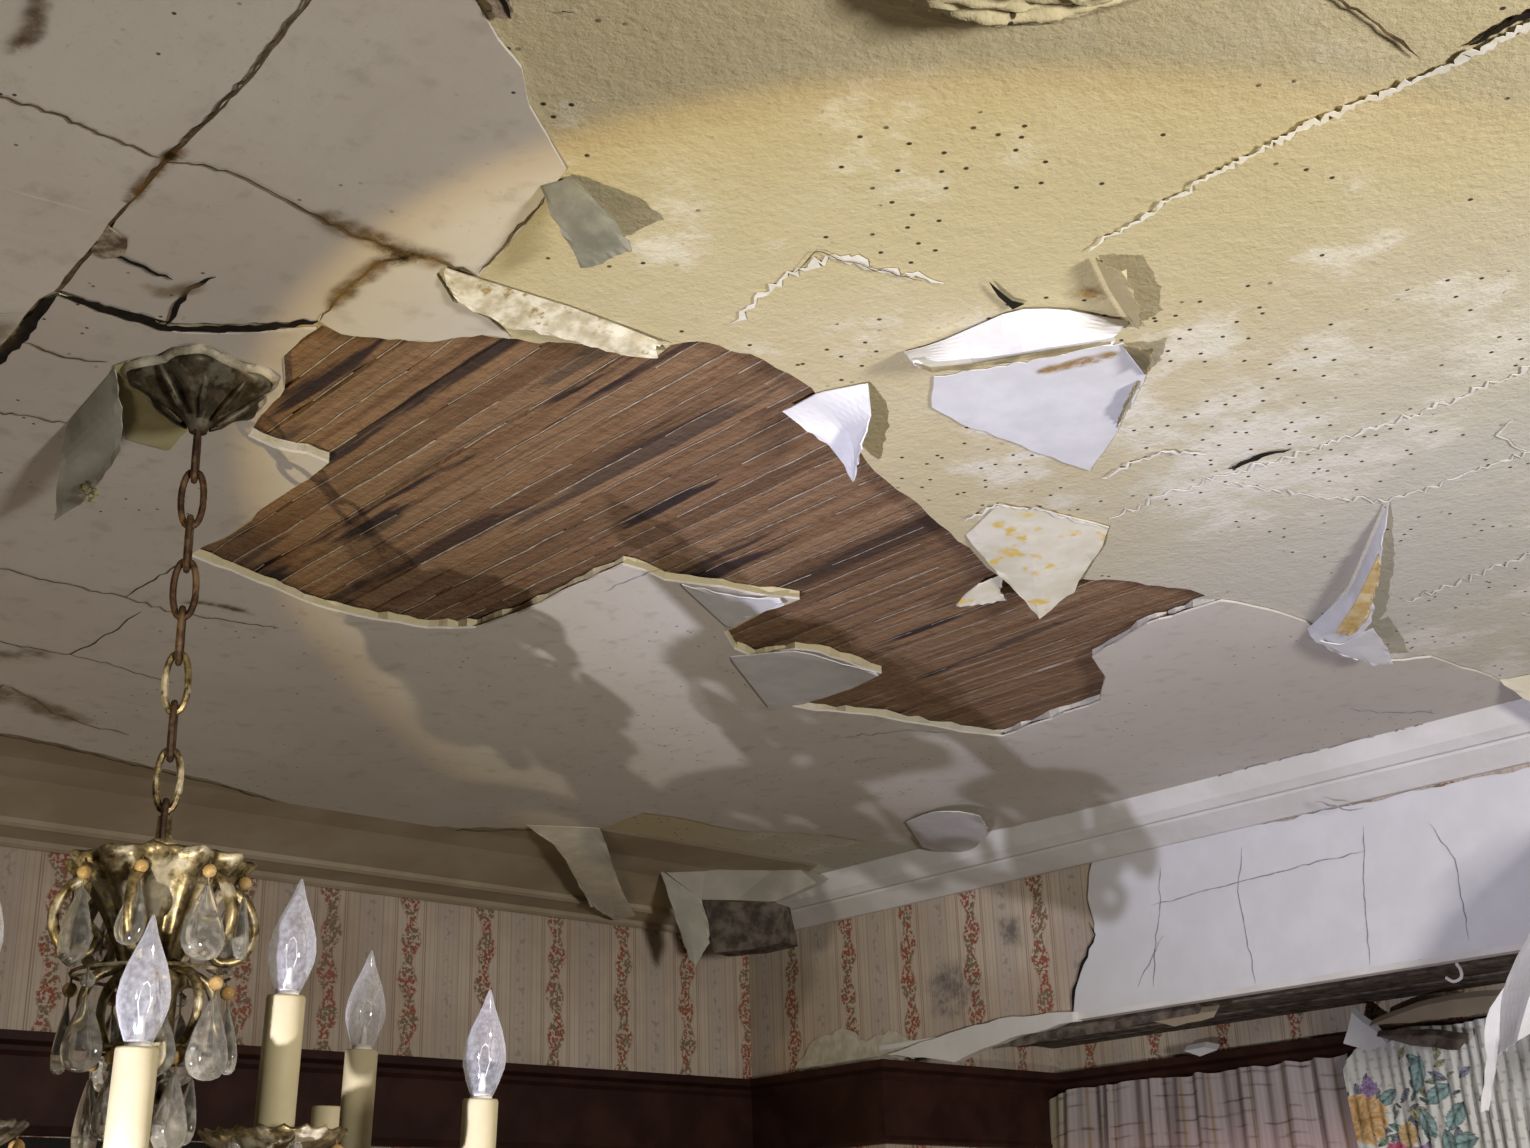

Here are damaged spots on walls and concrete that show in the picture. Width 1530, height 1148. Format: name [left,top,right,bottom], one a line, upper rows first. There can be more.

crack [0,0,542,365]
crack [1088,0,1530,252]
peeling [444,268,670,358]
crack [989,282,1024,310]
peeling [904,257,1153,471]
peeling [782,383,871,482]
crack [964,366,1530,527]
peeling [956,506,1109,619]
crack [0,566,277,683]
crack [0,685,275,802]
peeling [527,825,635,920]
peeling [1072,767,1530,1014]